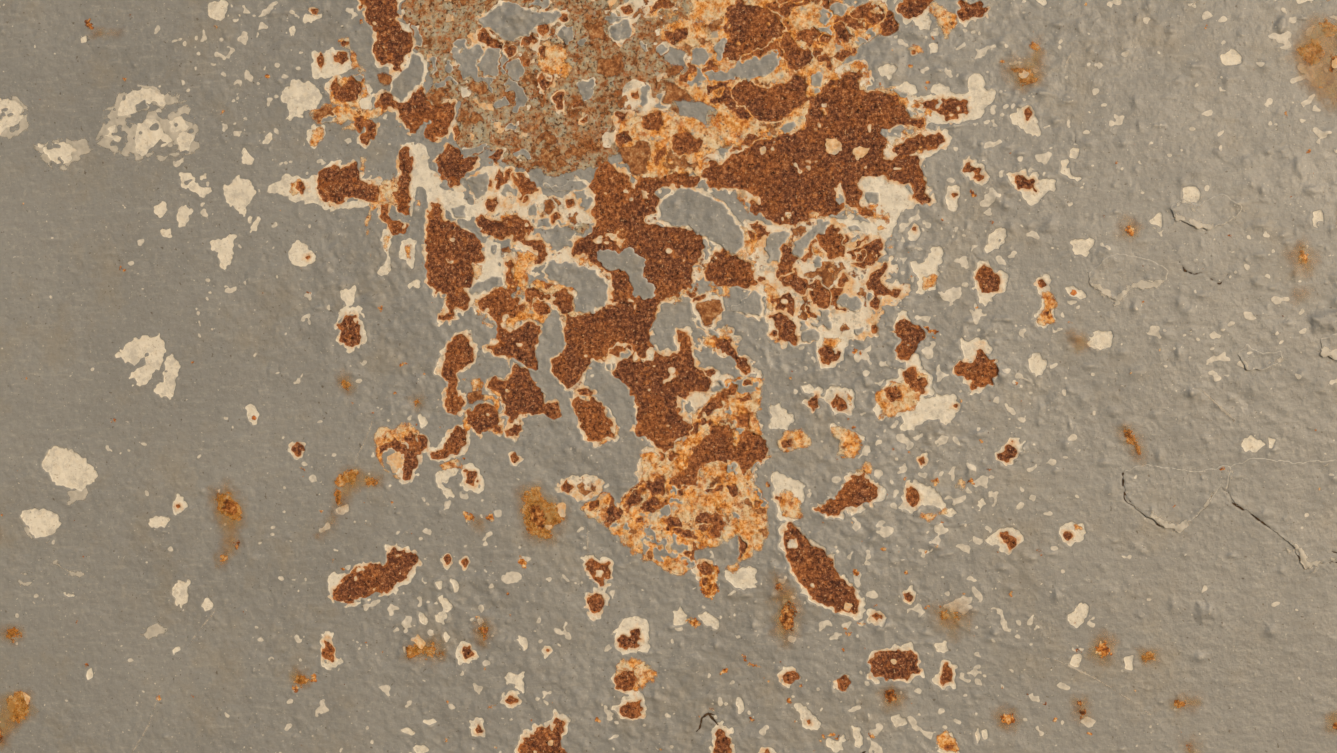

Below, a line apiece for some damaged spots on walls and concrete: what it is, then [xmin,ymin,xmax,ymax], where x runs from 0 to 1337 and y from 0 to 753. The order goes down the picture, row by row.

peeling [972,228,1009,306]
peeling [33,0,999,627]
peeling [20,446,98,543]
corrosion [319,469,379,515]
corrosion [520,486,566,539]
crack [1195,490,1271,529]
corrosion [673,564,757,629]
corrosion [406,634,444,660]
peeling [611,616,657,720]
peeling [867,641,958,690]
peeling [514,709,571,753]
corrosion [884,689,912,728]